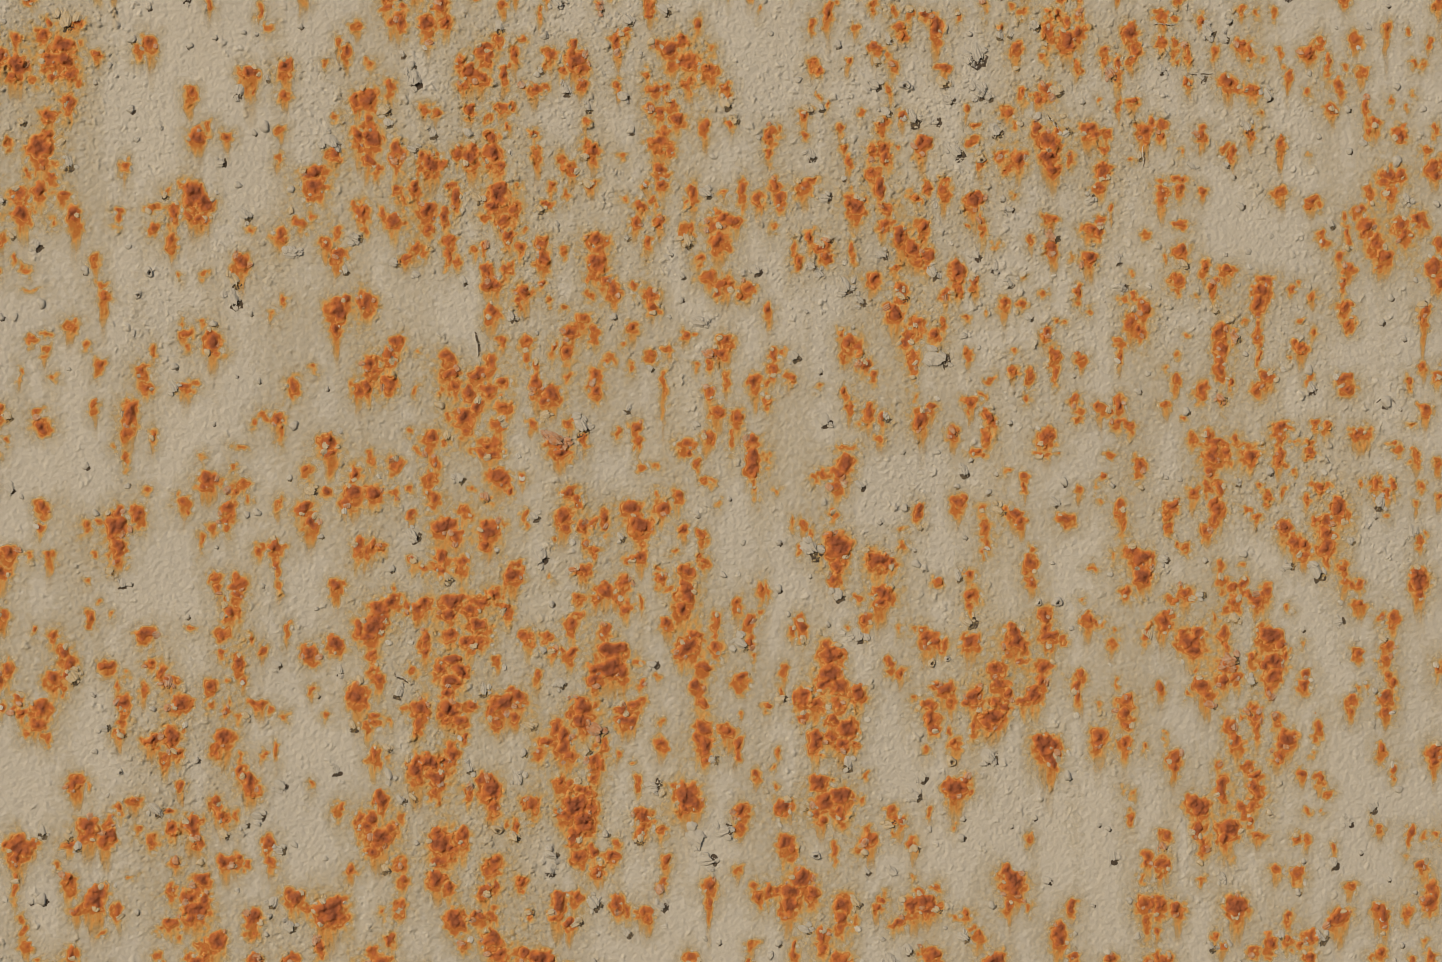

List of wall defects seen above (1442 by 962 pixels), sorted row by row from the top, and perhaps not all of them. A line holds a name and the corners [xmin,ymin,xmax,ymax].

corrosion [788,0,1442,889]
corrosion [991,862,1036,927]
corrosion [1047,896,1082,962]
corrosion [1102,951,1121,962]
corrosion [1131,828,1190,962]
corrosion [1209,814,1442,962]